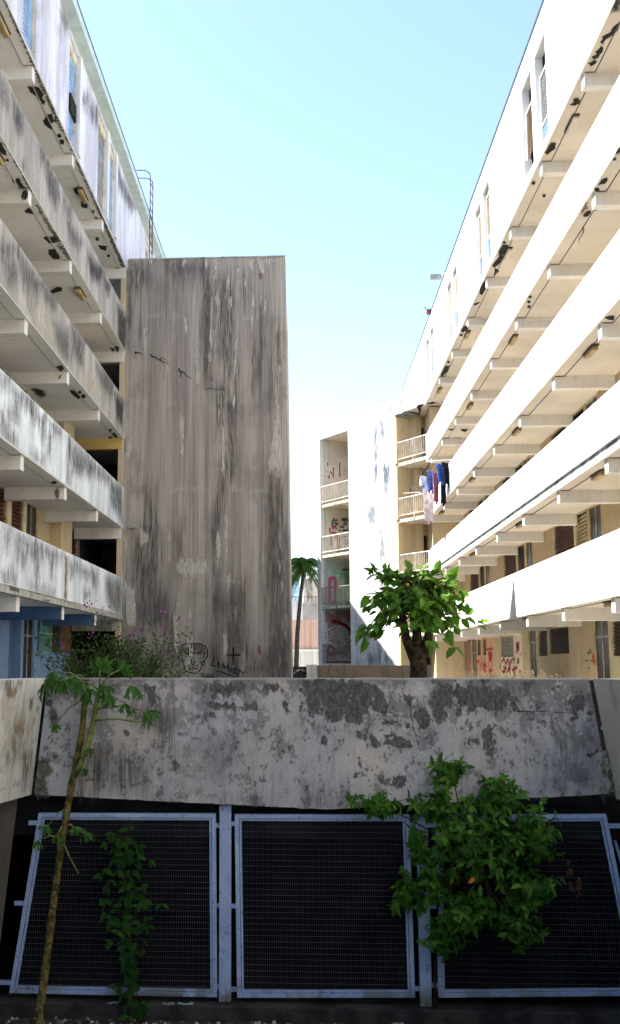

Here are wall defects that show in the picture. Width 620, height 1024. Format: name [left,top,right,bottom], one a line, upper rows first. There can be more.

damp [89,258,110,296]
damp [2,245,84,364]
damp [118,260,152,347]
crack [135,351,229,390]
damp [171,257,289,678]
damp [84,491,193,674]
damp [45,699,59,727]
peeling [139,681,159,707]
peeling [196,679,547,790]
crack [389,701,420,750]
peeling [568,690,593,722]
damp [81,751,140,792]